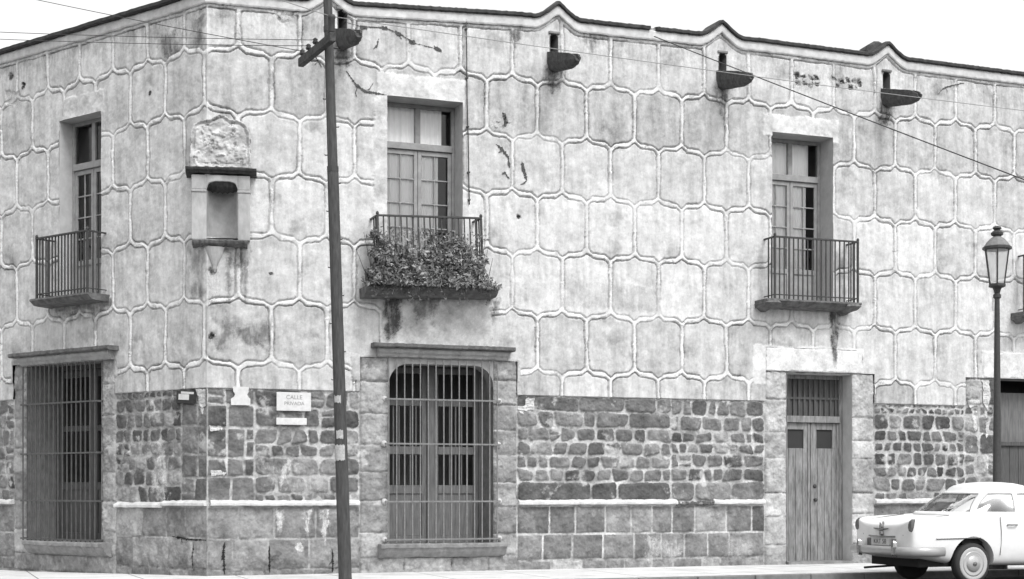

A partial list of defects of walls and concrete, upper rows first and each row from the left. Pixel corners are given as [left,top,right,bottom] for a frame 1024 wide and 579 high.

crack [342,22,442,52]
spalling [491,112,508,130]
leakage [383,299,402,338]
crack [172,536,226,574]